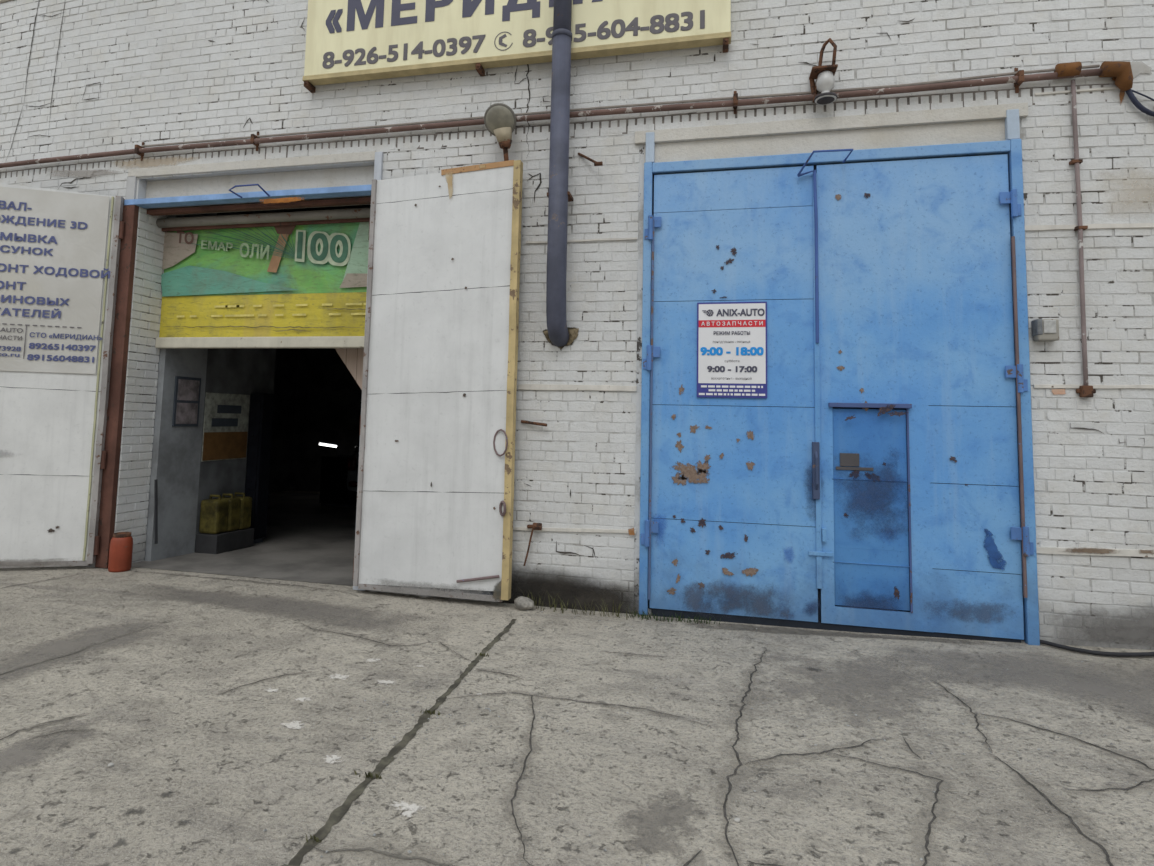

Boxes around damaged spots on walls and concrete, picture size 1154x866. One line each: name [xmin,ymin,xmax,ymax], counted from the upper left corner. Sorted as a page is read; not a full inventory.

water stain [506,583,628,613]